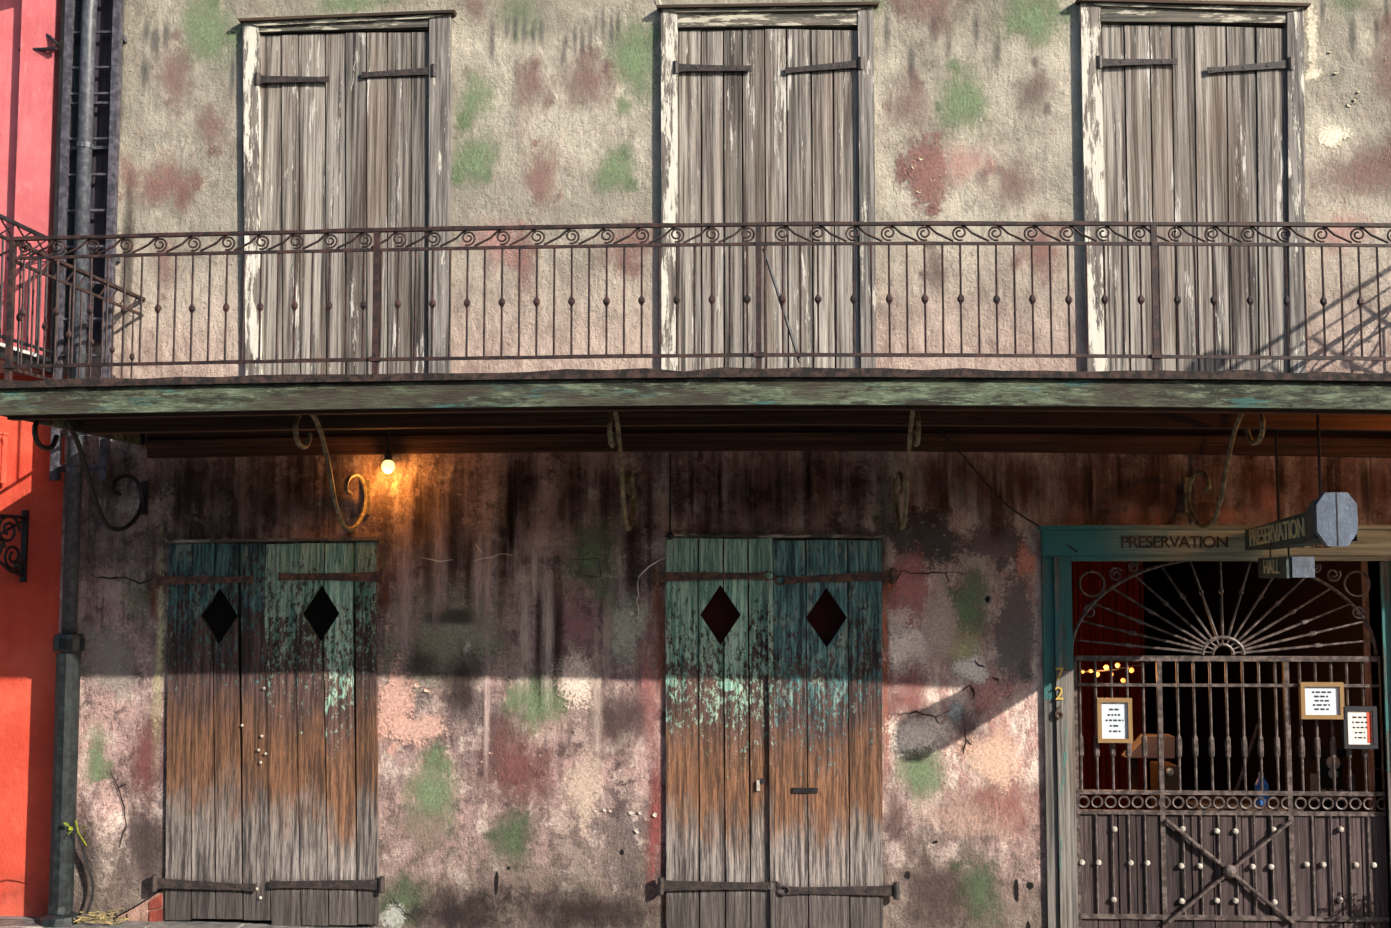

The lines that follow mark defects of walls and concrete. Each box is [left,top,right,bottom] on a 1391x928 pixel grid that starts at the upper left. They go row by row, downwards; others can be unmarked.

leakage [143,27,186,109]
leakage [1304,2,1325,81]
leakage [895,86,955,219]
leakage [1310,124,1391,196]
leakage [484,230,536,282]
leakage [611,228,648,272]
leakage [1015,218,1065,271]
leakage [175,456,342,526]
leakage [380,474,530,751]
leakage [522,548,561,671]
leakage [594,683,645,750]
leakage [411,888,656,928]